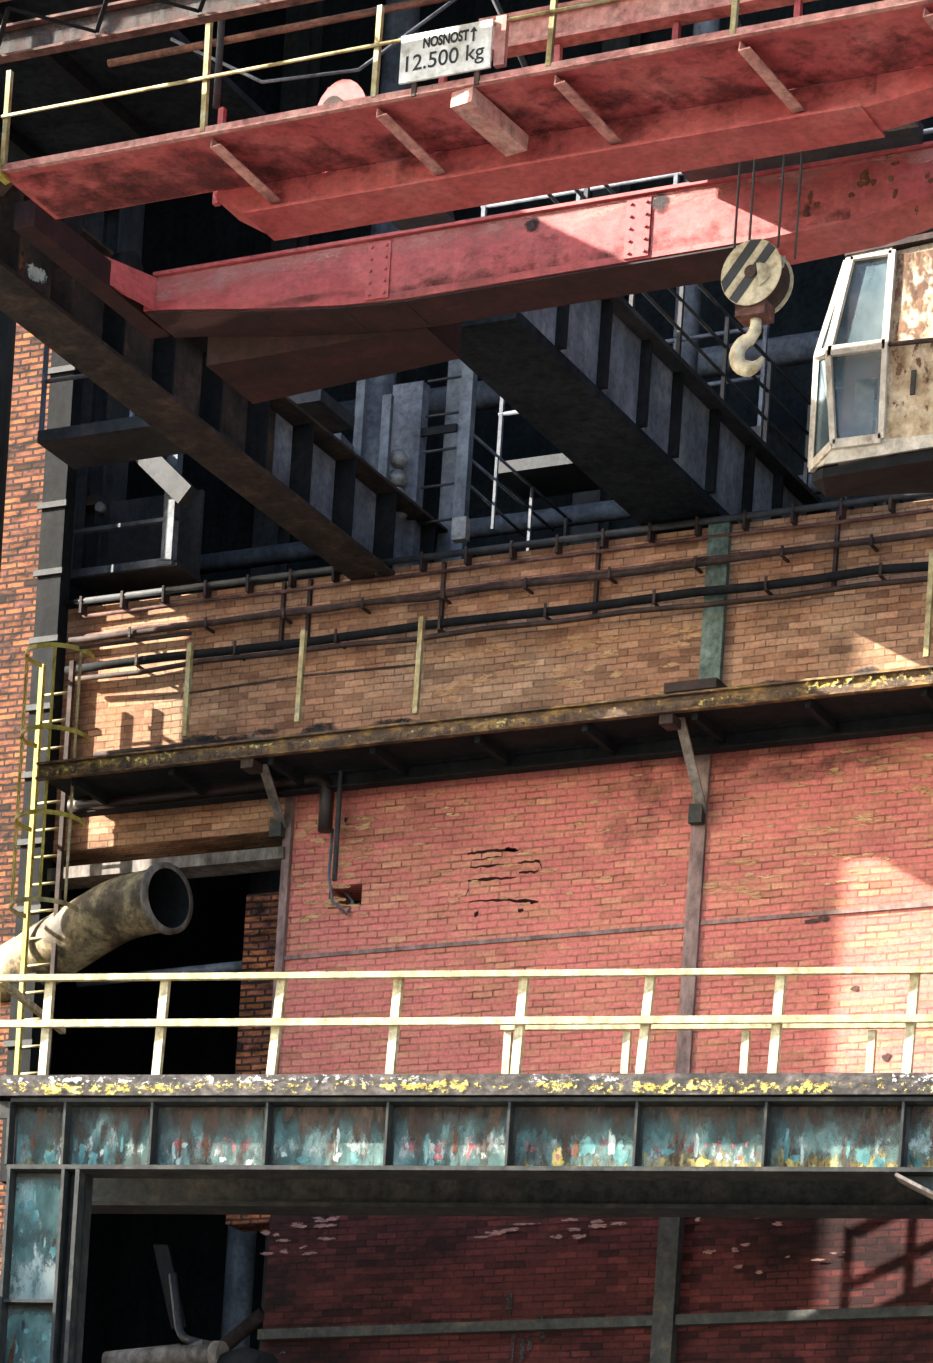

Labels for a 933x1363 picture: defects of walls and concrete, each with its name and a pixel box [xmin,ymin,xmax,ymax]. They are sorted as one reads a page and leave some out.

corrosion [889,249,933,383]
crack [465,847,542,917]
peeling [3,1053,933,1167]
peeling [5,1182,60,1363]